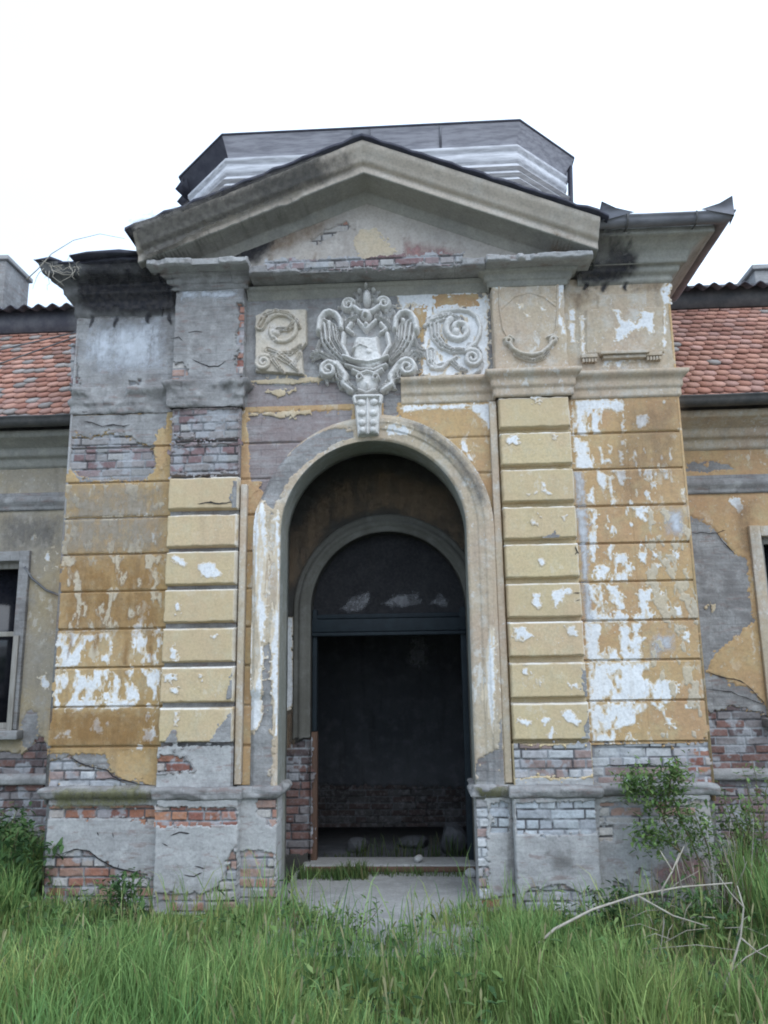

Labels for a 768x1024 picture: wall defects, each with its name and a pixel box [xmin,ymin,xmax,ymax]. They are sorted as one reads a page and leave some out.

flaking render [263,251,465,274]
peeling [608,283,672,353]
peeling [0,304,768,916]
crack [71,758,149,785]
crack [60,832,142,874]